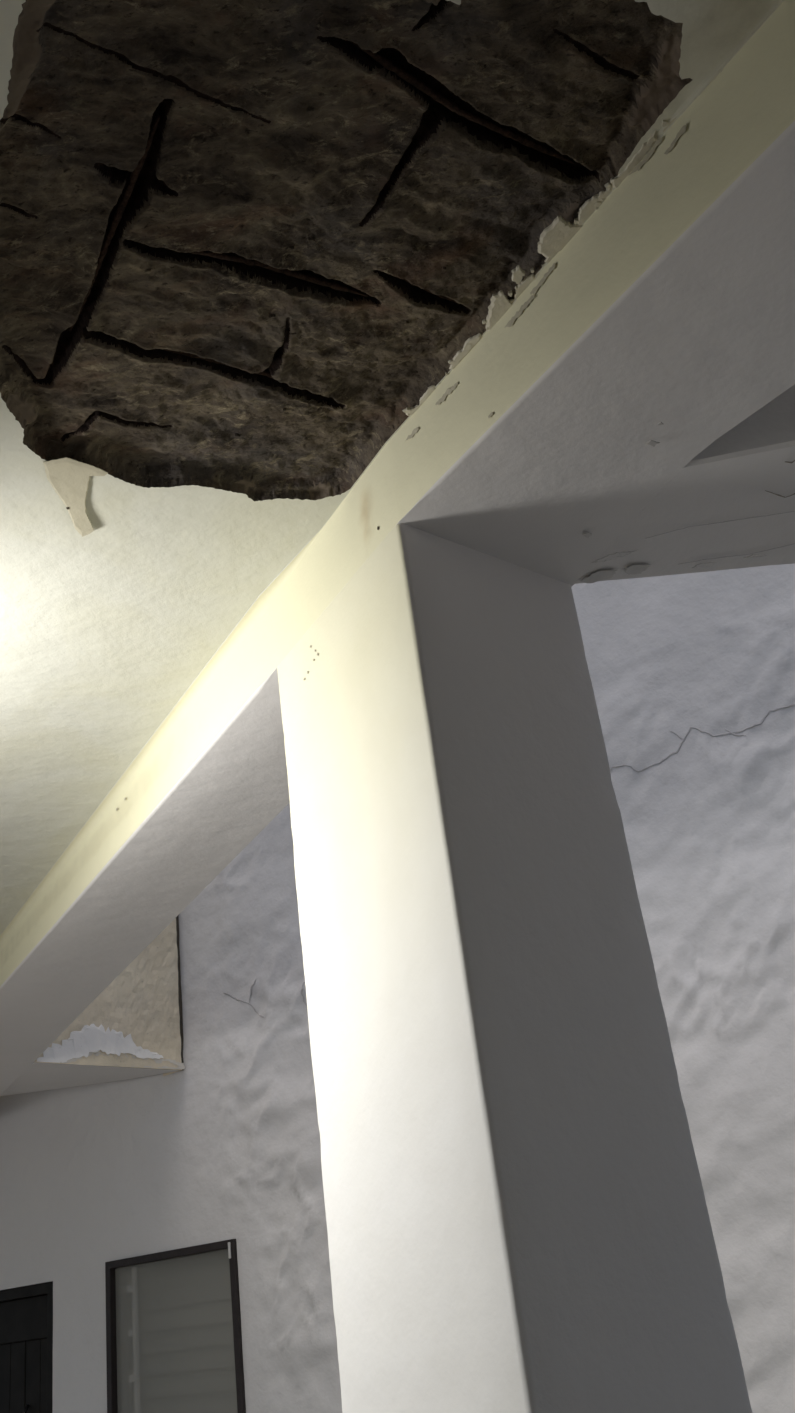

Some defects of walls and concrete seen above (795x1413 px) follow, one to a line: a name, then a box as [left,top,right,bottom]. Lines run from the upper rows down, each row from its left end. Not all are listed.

spalling [0,0,701,537]
peeling [580,549,651,583]
crack [610,704,795,772]